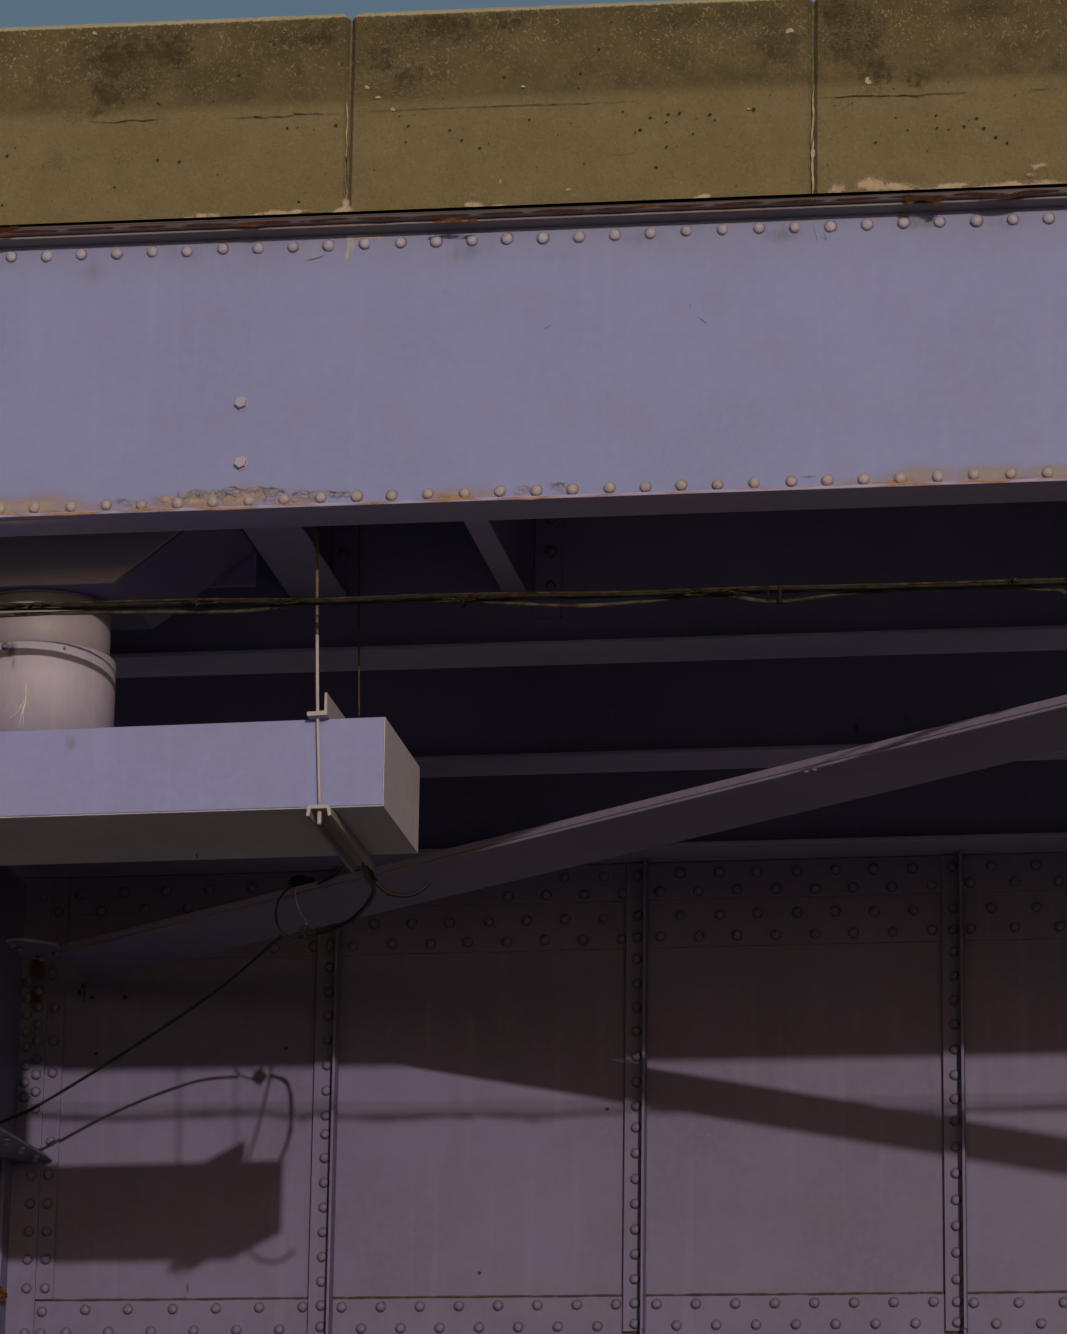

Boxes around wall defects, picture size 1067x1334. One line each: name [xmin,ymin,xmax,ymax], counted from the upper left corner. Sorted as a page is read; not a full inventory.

rust [0,500,94,515]